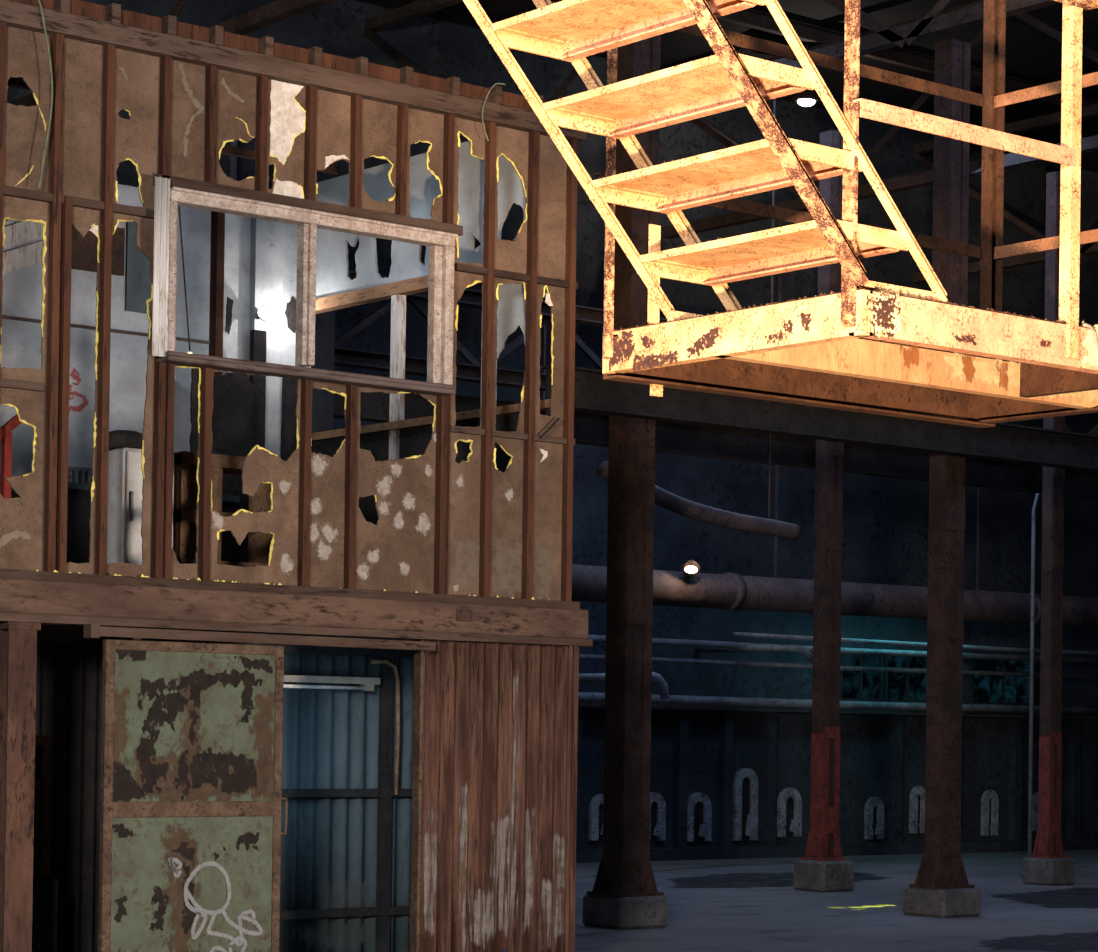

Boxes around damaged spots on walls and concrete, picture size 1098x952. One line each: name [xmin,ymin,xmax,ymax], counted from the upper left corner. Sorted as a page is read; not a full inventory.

corrosion [900,345,919,368]
corrosion [962,355,975,382]
corrosion [997,362,1008,390]
peeling [115,650,146,661]
peeling [113,656,273,802]
peeling [112,823,133,838]
peeling [214,832,260,861]
water stain [459,724,564,951]
water stain [424,809,438,934]
peeling [172,842,198,934]
peeling [114,895,127,922]
peeling [150,886,169,933]